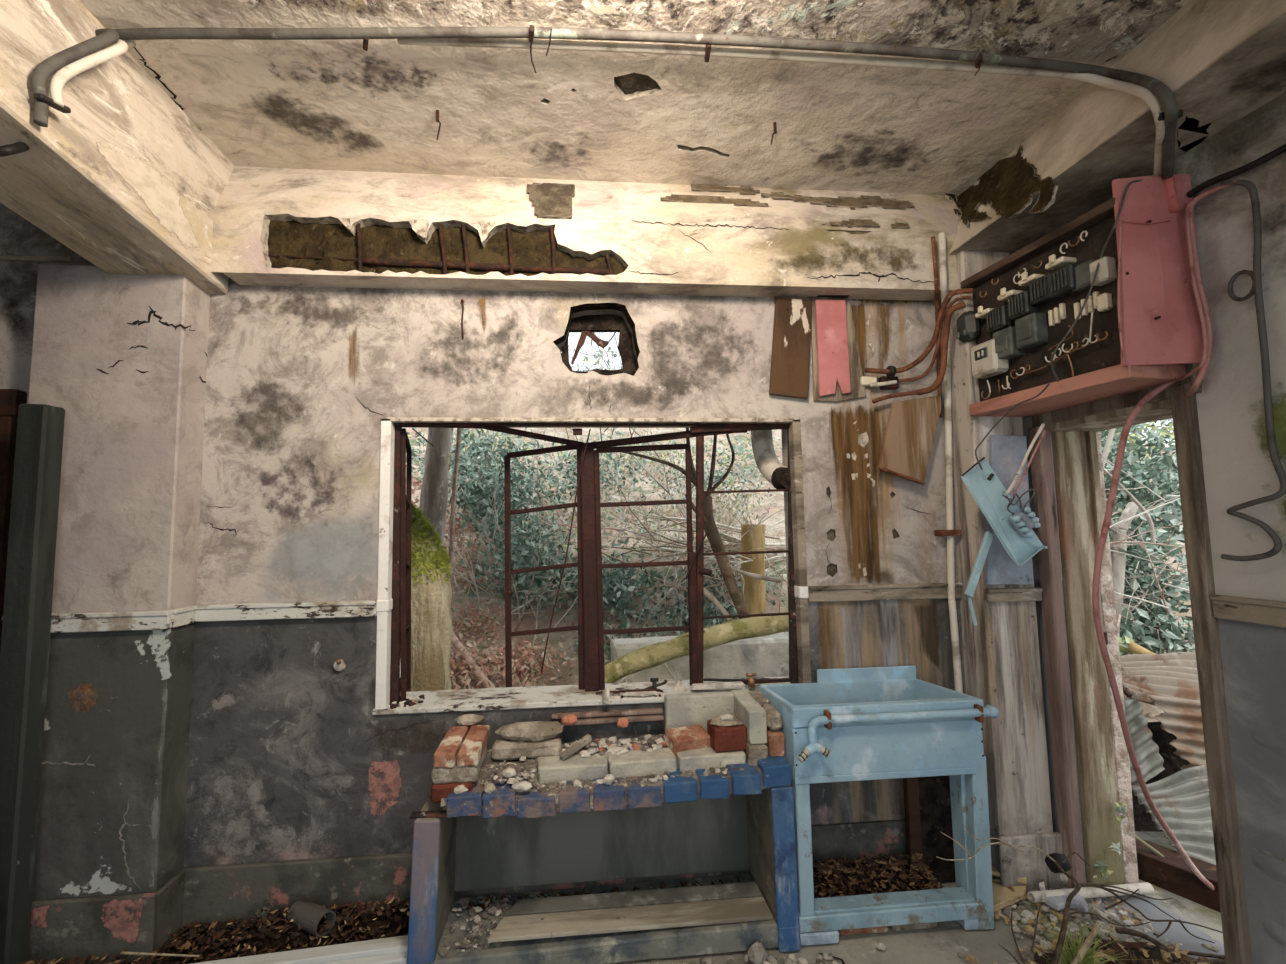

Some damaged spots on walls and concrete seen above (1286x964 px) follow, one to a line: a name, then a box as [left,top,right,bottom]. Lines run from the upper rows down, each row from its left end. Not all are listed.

crack [133,47,201,130]
spalling [614,73,662,100]
spalling [261,182,629,276]
spalling [660,184,915,234]
spalling [945,145,1058,228]
crack [807,272,934,283]
crack [97,306,207,383]
water stain [282,293,365,375]
hole [553,303,640,376]
water stain [582,324,751,408]
mould [236,384,302,450]
water stain [262,455,336,519]